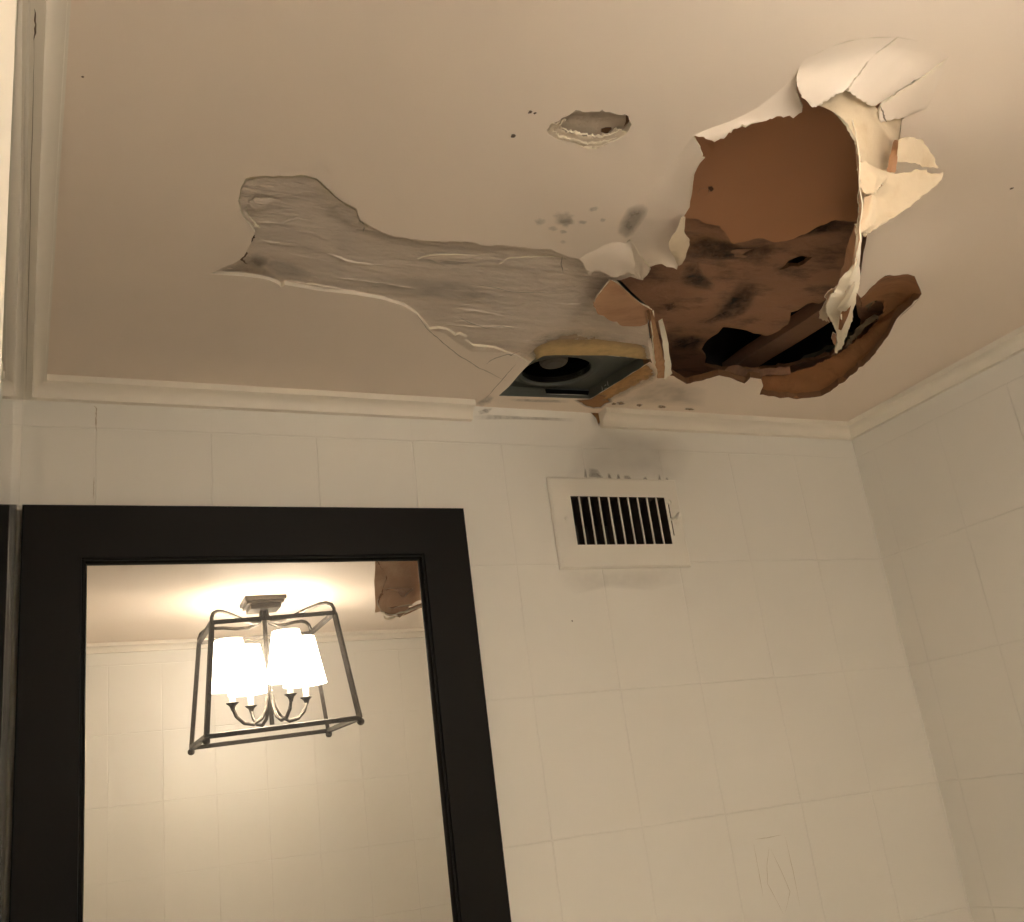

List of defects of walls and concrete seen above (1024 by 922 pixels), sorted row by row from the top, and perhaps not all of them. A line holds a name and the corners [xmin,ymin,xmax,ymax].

flaking render [547,110,629,149]
water stain [534,336,646,359]